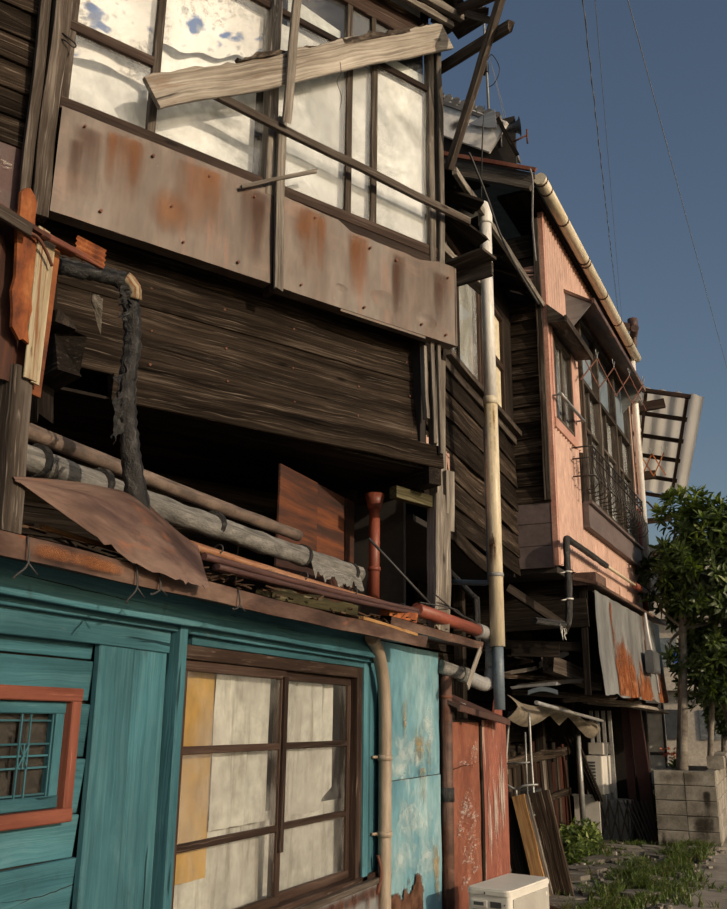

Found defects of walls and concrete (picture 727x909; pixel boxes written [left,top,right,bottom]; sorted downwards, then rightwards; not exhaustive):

corrosion [39,546,121,573]
peeling [391,873,424,909]